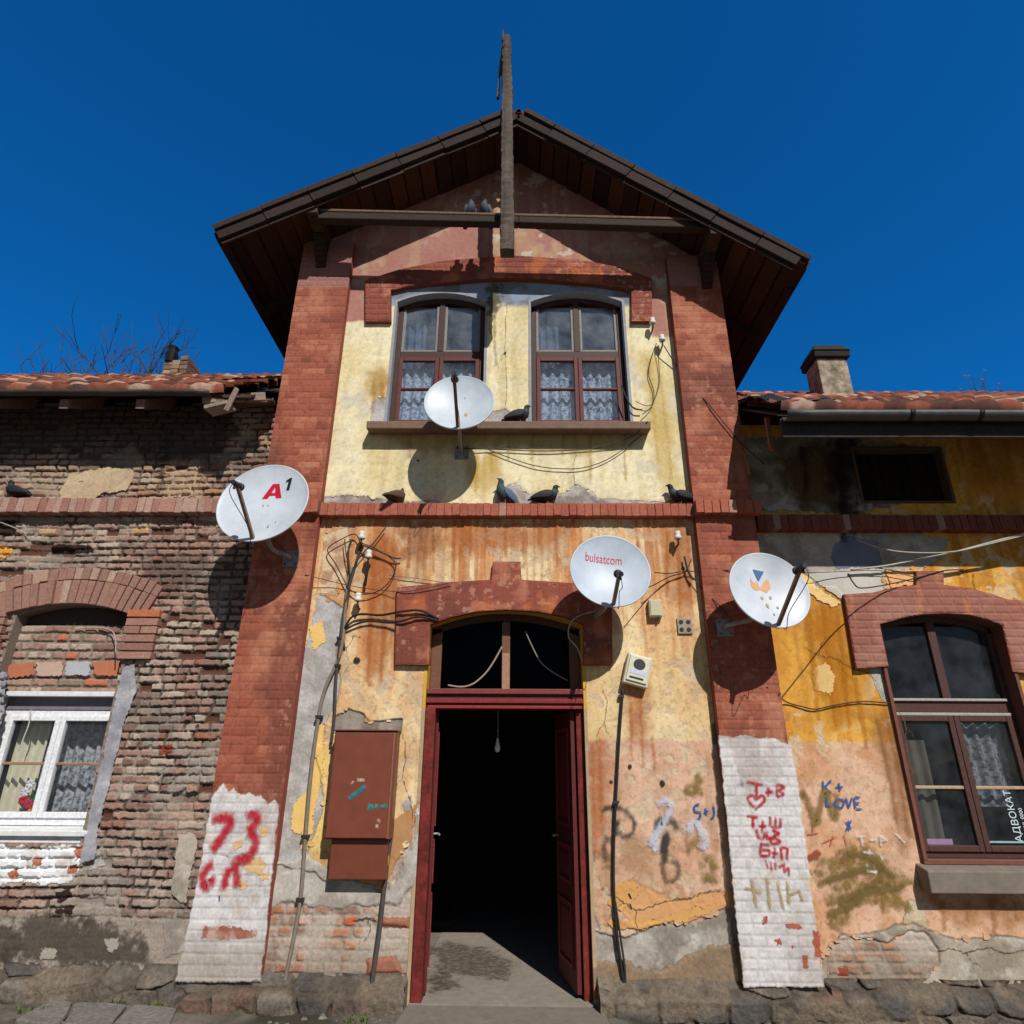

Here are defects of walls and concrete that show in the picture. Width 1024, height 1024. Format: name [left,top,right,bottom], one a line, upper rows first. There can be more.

spalling [324,495,440,504]
spalling [506,481,691,504]
water stain [827,438,860,515]
spalling [0,520,16,536]
spalling [39,528,94,554]
peeling [812,662,835,696]
flaking render [870,668,888,702]
spalling [158,744,174,755]
flaking render [264,527,420,978]
peeling [0,843,85,915]
flaking render [593,876,743,1008]
flaking render [821,899,1024,986]